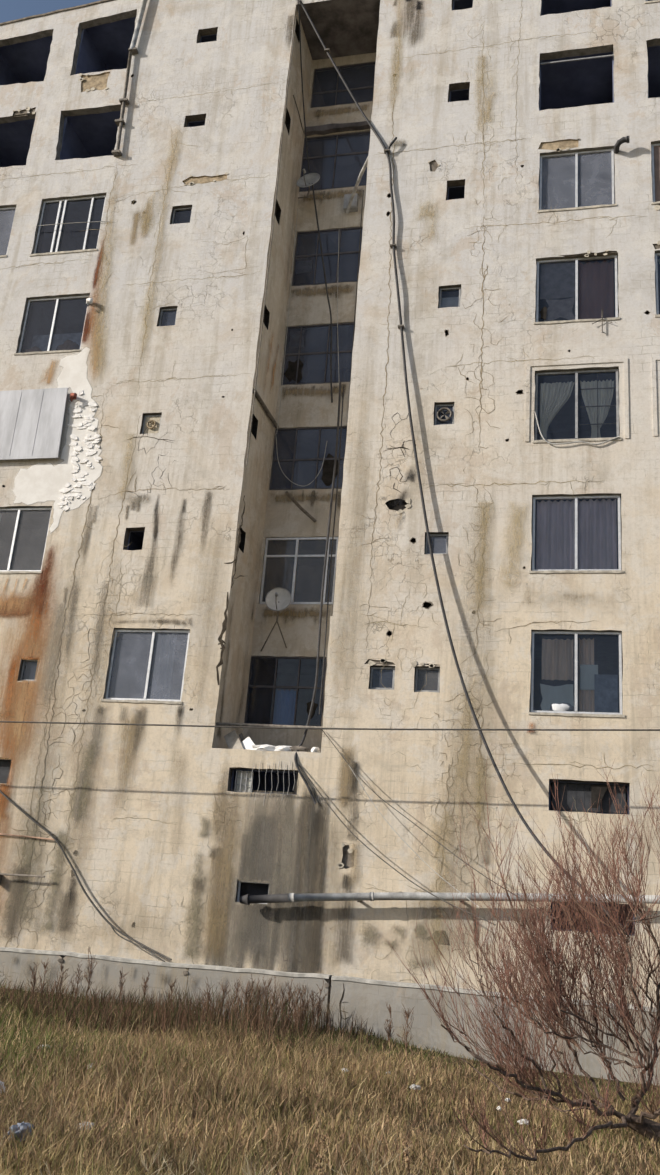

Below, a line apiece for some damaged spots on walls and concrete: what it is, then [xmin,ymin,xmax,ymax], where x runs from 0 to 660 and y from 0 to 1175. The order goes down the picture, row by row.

spalling [79,72,110,92]
damp [391,0,421,88]
spalling [182,172,228,186]
corrosion [83,247,103,370]
peeling [4,347,103,533]
crack [2,128,267,949]
damp [121,444,158,604]
crack [339,0,651,1029]
corrosion [0,553,52,819]
damp [5,811,38,935]
damp [42,833,73,930]
damp [195,791,327,986]